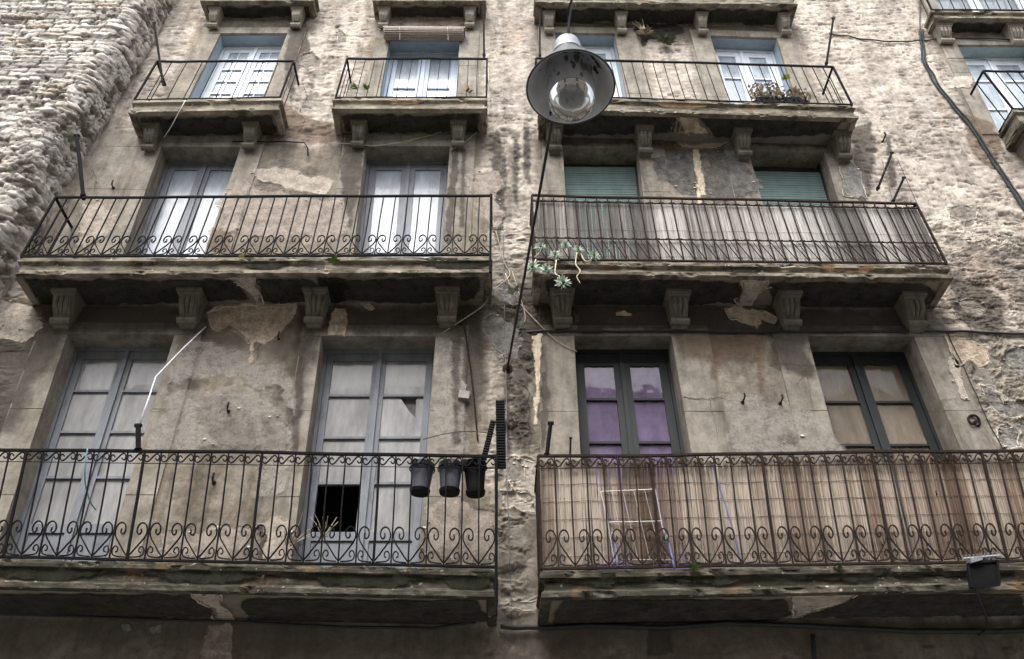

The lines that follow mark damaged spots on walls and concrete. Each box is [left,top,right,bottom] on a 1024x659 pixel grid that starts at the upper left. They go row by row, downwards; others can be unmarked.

damp [140,6,530,244]
flaking render [206,278,297,363]
flaking render [724,280,778,330]
flaking render [945,334,1024,448]
flaking render [499,597,537,612]